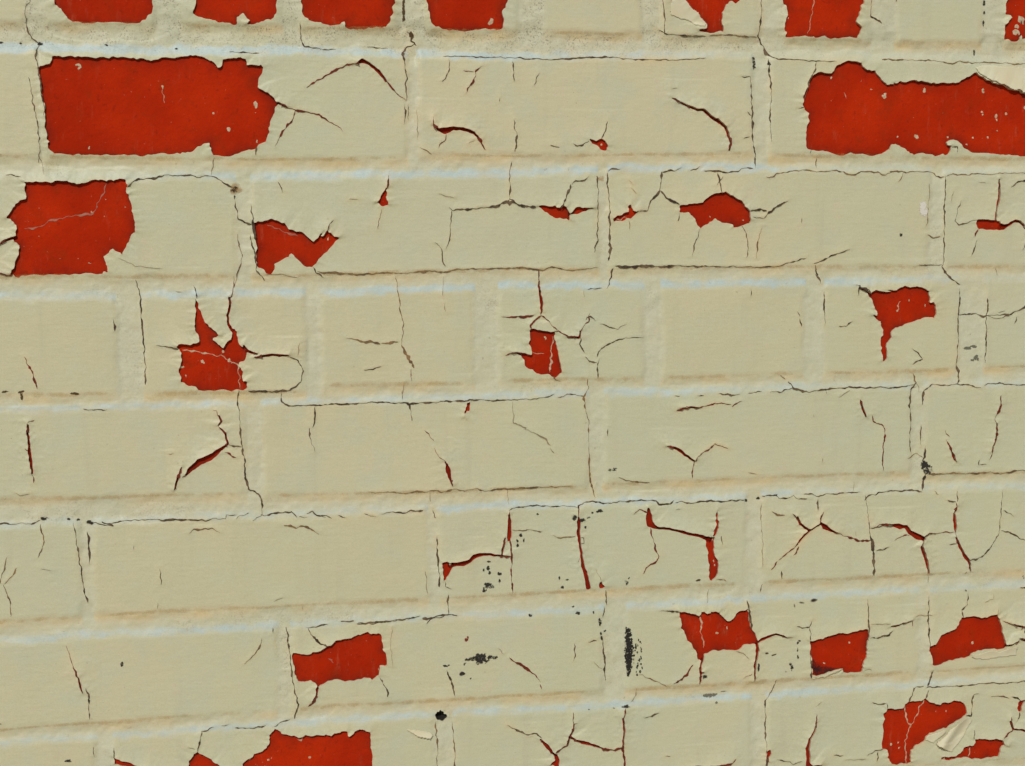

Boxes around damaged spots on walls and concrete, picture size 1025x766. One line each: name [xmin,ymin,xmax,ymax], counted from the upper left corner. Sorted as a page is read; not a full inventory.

peeling [39,55,280,157]
crack [255,25,485,155]
crack [442,56,704,91]
peeling [803,61,1025,156]
peeling [7,179,135,278]
crack [630,0,1025,580]
peeling [177,301,248,391]
crack [73,121,851,664]
crack [192,629,318,752]
peeling [292,632,387,689]
crack [868,601,932,646]
peeling [243,729,373,766]